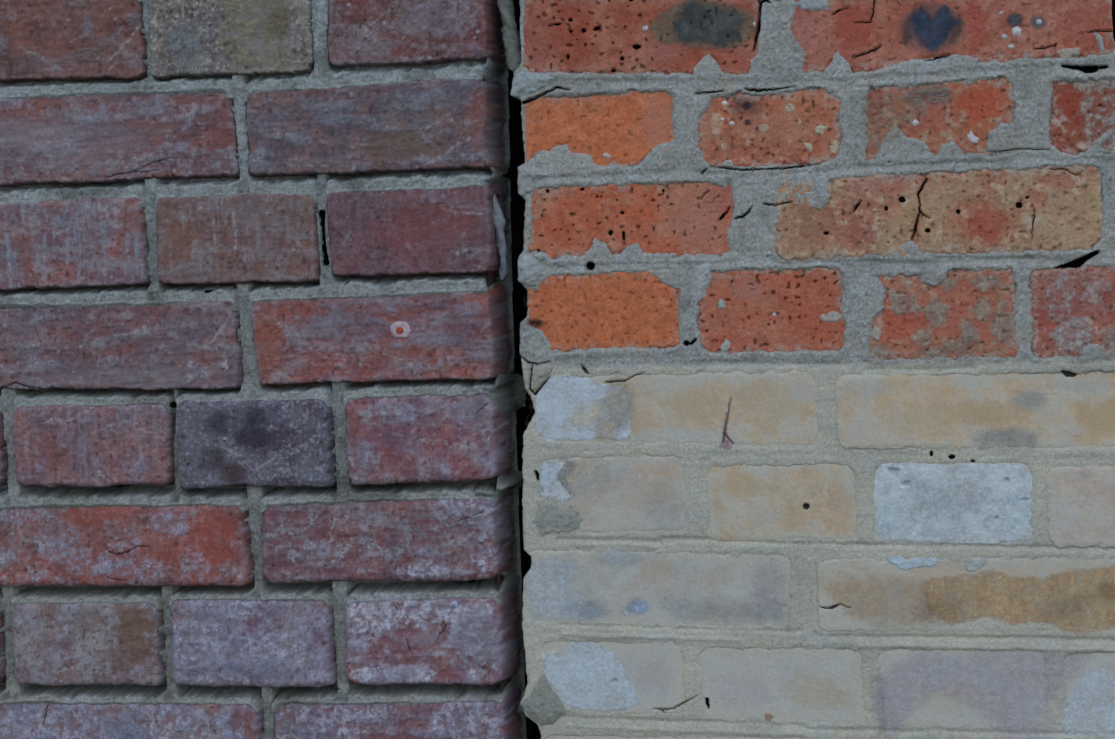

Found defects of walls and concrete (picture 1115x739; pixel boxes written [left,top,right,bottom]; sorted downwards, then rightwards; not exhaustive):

crack [753,0,770,48]
crack [911,179,927,239]
peeling [535,374,631,442]
peeling [873,462,1032,545]
crack [104,545,147,581]
peeling [841,556,1115,633]
peeling [541,641,640,712]
peeling [1063,668,1115,739]